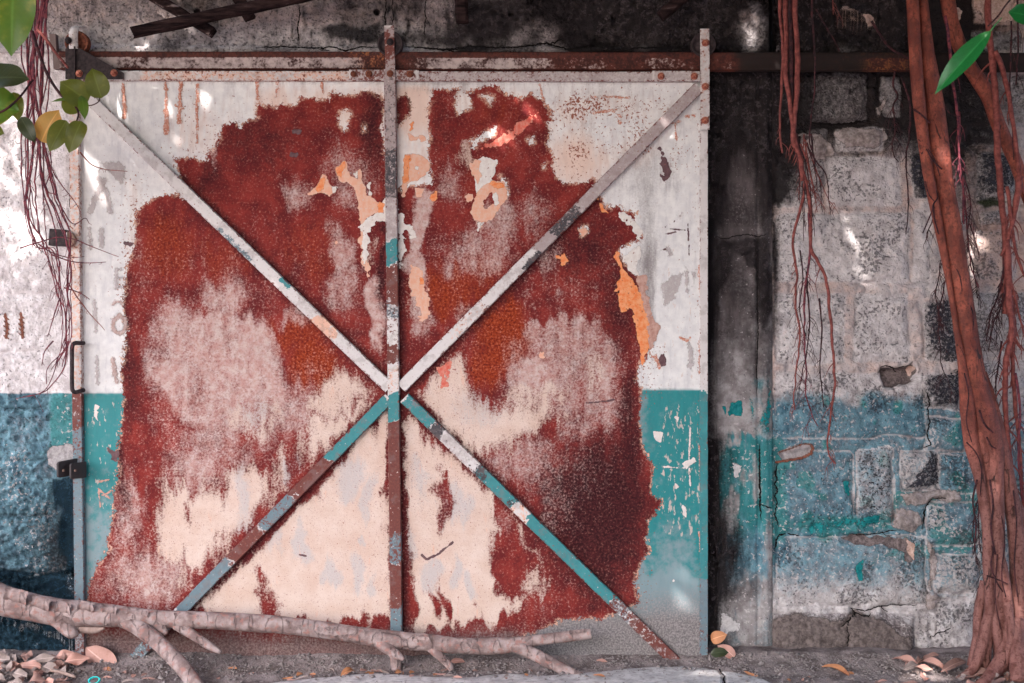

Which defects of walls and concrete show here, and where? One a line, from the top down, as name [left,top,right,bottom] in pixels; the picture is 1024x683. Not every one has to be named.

damp [715,161,778,328]
rust [86,81,663,638]
spalling [880,365,917,388]
spalling [775,443,814,464]
crack [758,444,799,549]
damp [708,438,742,643]
rust [87,627,155,653]
rust [164,628,386,656]
crack [841,604,915,647]